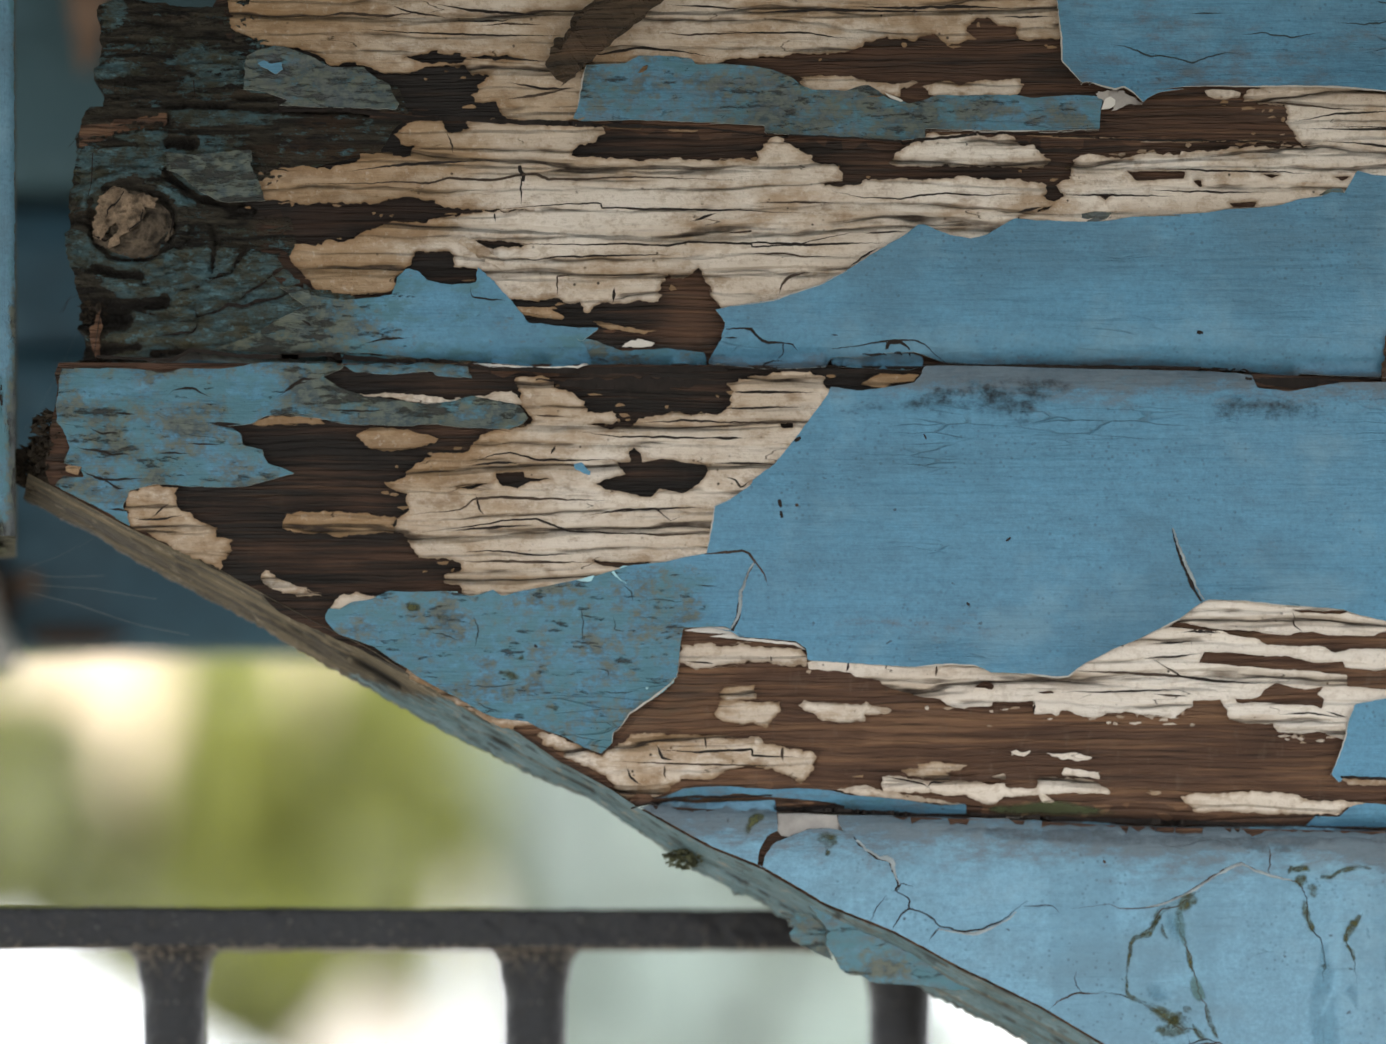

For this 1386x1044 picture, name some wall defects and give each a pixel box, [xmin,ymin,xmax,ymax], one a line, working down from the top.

peeling [165,0,1386,348]
peeling [66,465,81,475]
peeling [124,358,1386,837]
crack [1171,526,1205,603]
crack [1341,774,1386,782]
crack [631,794,1386,1044]